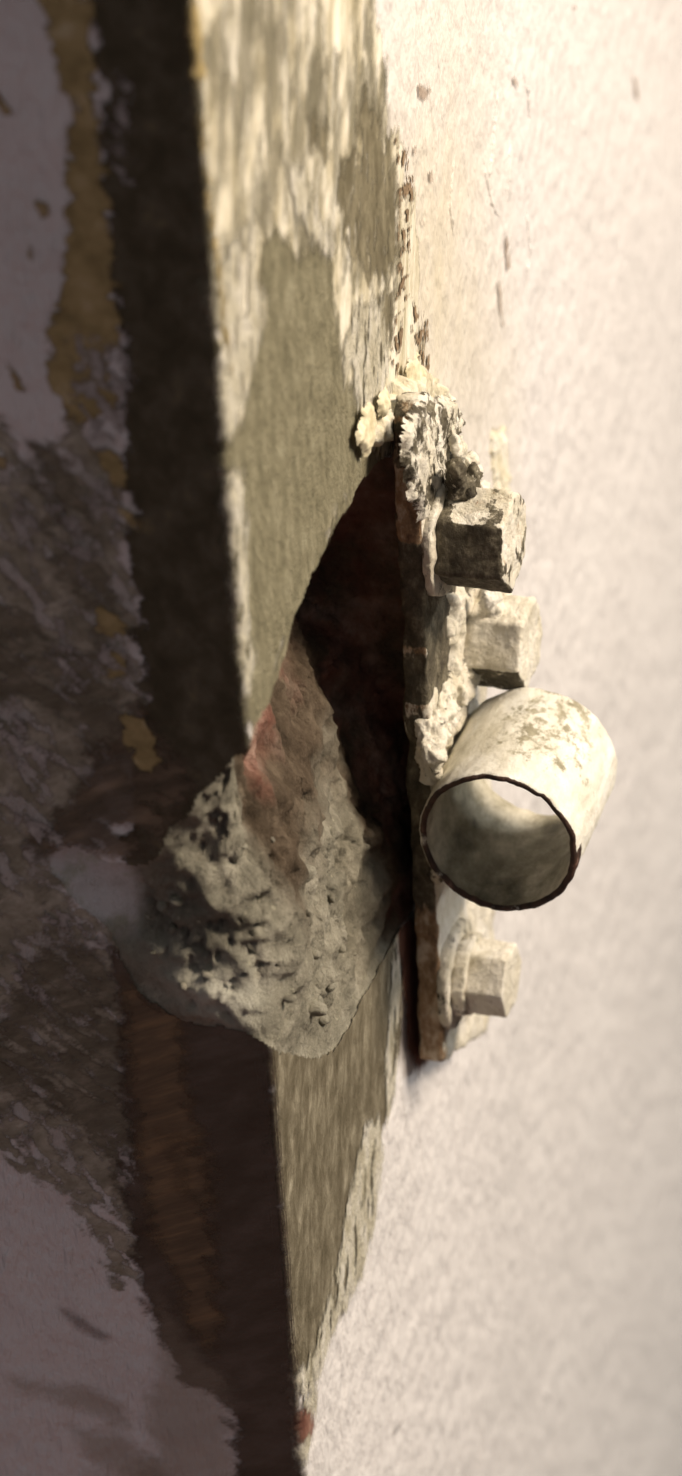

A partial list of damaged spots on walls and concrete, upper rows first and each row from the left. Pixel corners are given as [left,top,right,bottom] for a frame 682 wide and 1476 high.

peeling [498,237,511,326]
spalling [45,0,457,1476]
rust [397,917,425,1073]
rust [293,1409,315,1442]